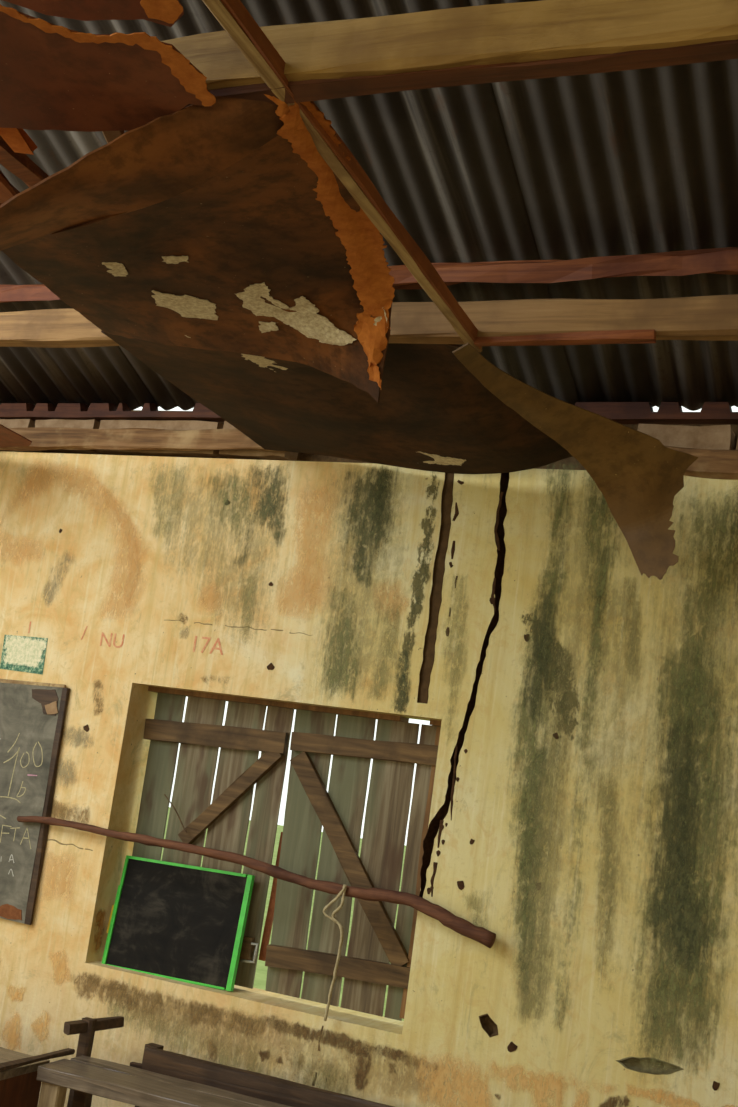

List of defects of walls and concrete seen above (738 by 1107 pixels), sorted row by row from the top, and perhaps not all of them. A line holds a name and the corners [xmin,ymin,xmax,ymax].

peeling [102,262,128,276]
peeling [162,255,189,264]
peeling [151,290,219,320]
peeling [241,354,288,372]
peeling [236,282,357,346]
leakage [343,466,390,585]
leakage [550,466,572,537]
leakage [323,589,358,697]
leakage [374,475,439,712]
crack [419,473,509,898]
leakage [515,477,617,1013]
leakage [643,498,738,1058]